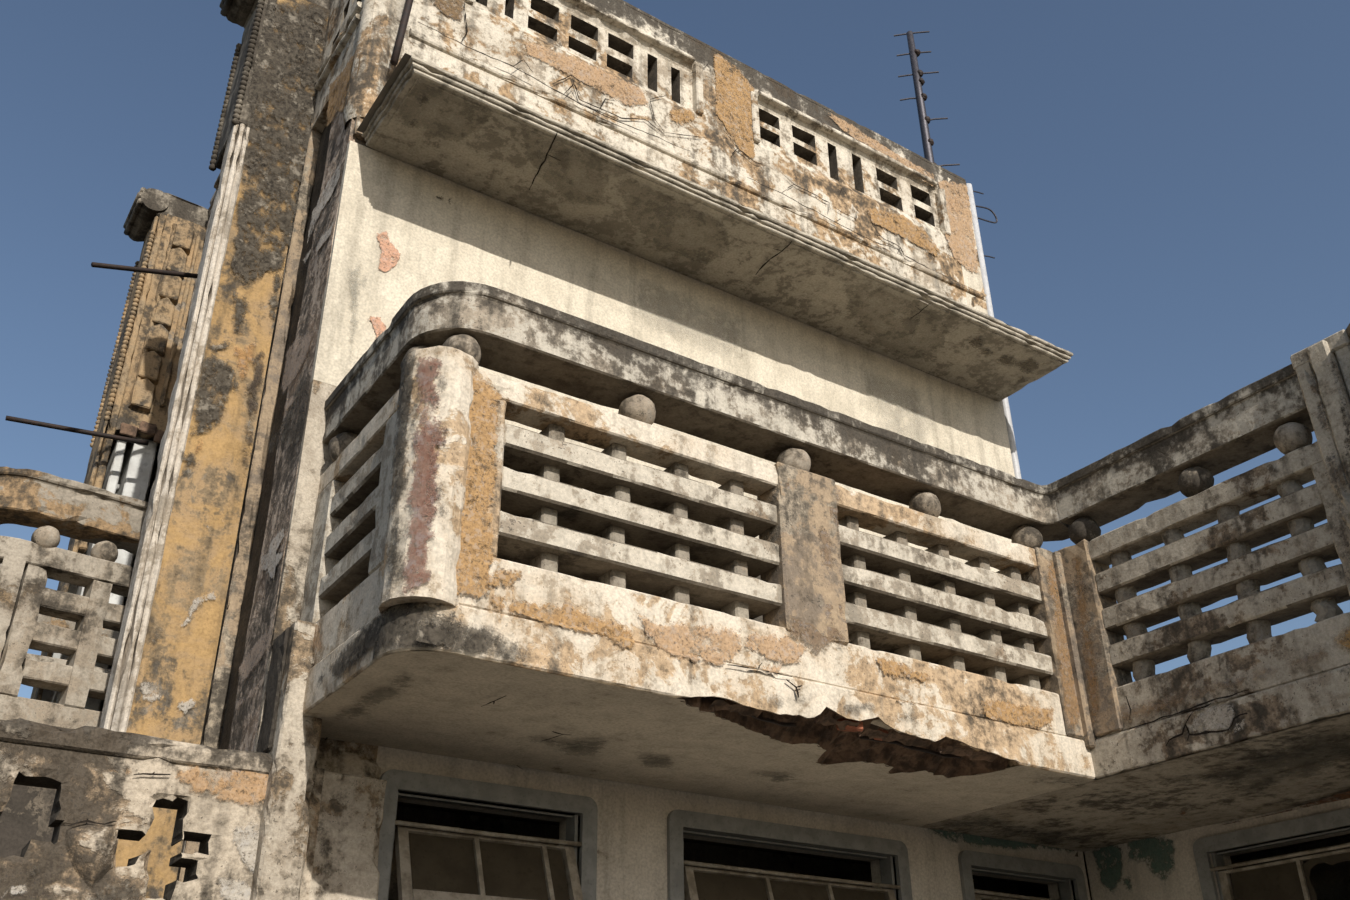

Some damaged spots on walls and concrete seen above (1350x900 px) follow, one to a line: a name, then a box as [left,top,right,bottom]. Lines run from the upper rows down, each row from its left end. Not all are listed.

damp [191,0,329,467]
peeling [377,231,401,272]
crack [418,3,959,283]
peeling [713,53,755,158]
peeling [830,114,980,273]
peeling [369,316,386,337]
damp [181,452,196,474]
corrosion [402,356,449,593]
peeling [456,374,808,673]
spalling [680,697,1009,778]
peeling [876,657,930,685]
peeling [981,698,1054,730]